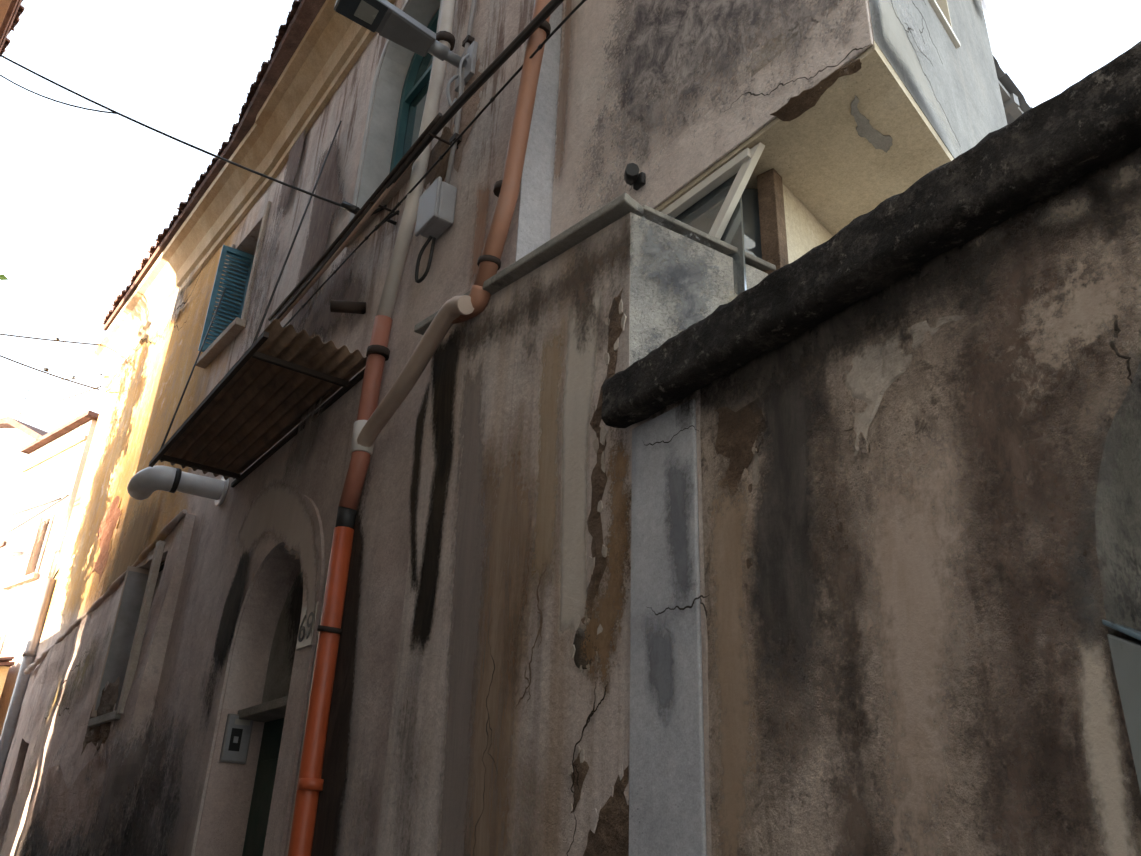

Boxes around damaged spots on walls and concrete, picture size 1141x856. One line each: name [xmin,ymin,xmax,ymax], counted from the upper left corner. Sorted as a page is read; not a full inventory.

leakage [577,0,862,208]
crack [722,45,869,112]
peeling [1009,241,1141,407]
crack [1061,268,1137,383]
spalling [92,496,122,582]
leakage [410,221,633,856]
crack [573,288,627,632]
leakage [652,147,1141,856]
leakage [647,624,674,720]
spalling [568,746,589,814]
crack [567,682,608,856]
spalling [583,762,629,856]